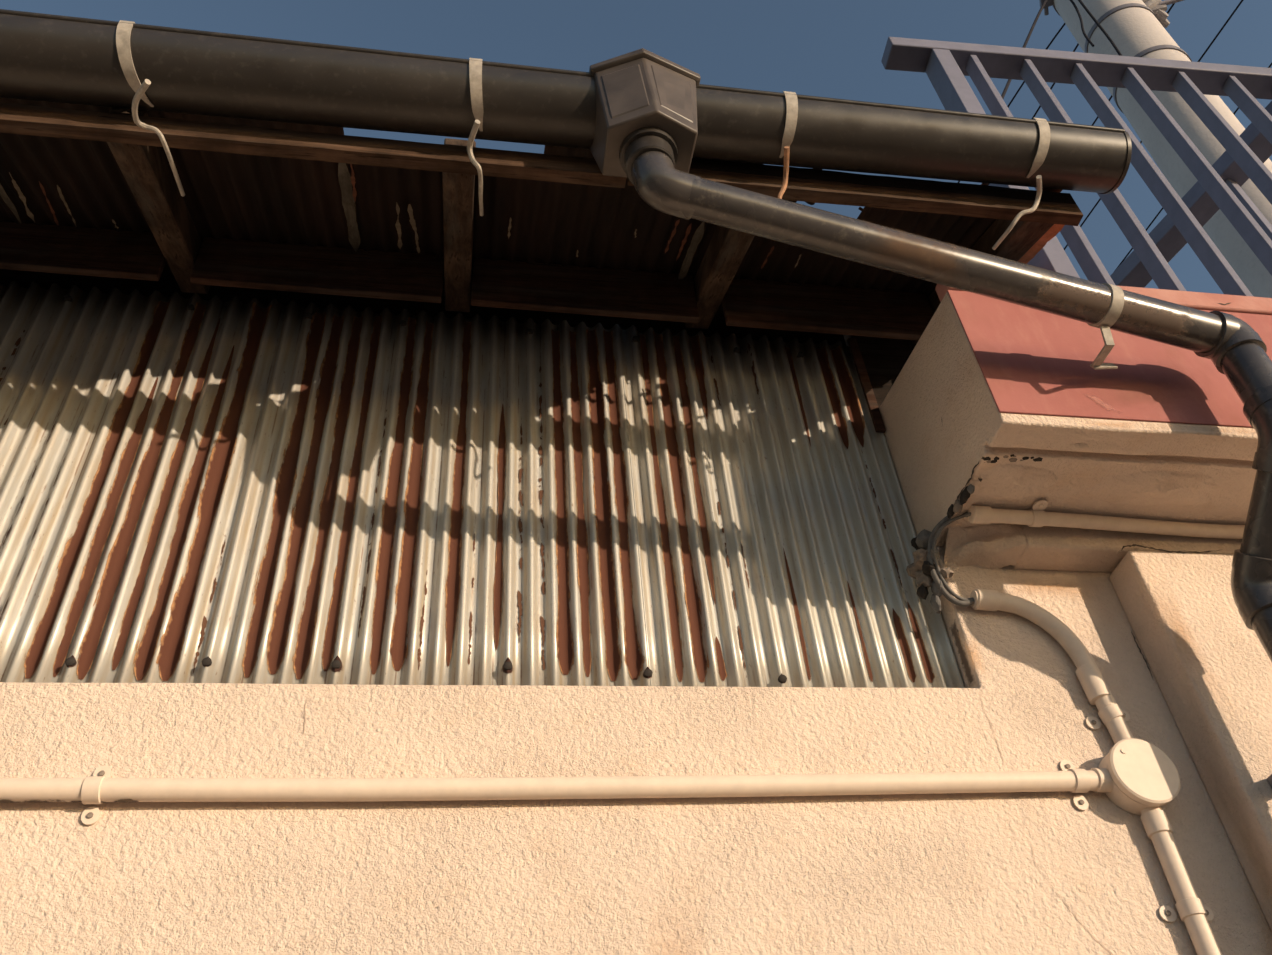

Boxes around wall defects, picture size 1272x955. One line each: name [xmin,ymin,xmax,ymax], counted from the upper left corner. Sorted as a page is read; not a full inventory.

corrosion [24,299,272,681]
corrosion [242,311,382,679]
corrosion [358,316,434,674]
corrosion [445,322,475,666]
corrosion [494,404,523,673]
corrosion [538,329,651,681]
corrosion [640,330,749,682]
corrosion [783,548,811,681]
corrosion [816,346,886,529]
corrosion [890,549,935,683]
spalling [981,454,1043,463]
crack [1118,544,1219,564]